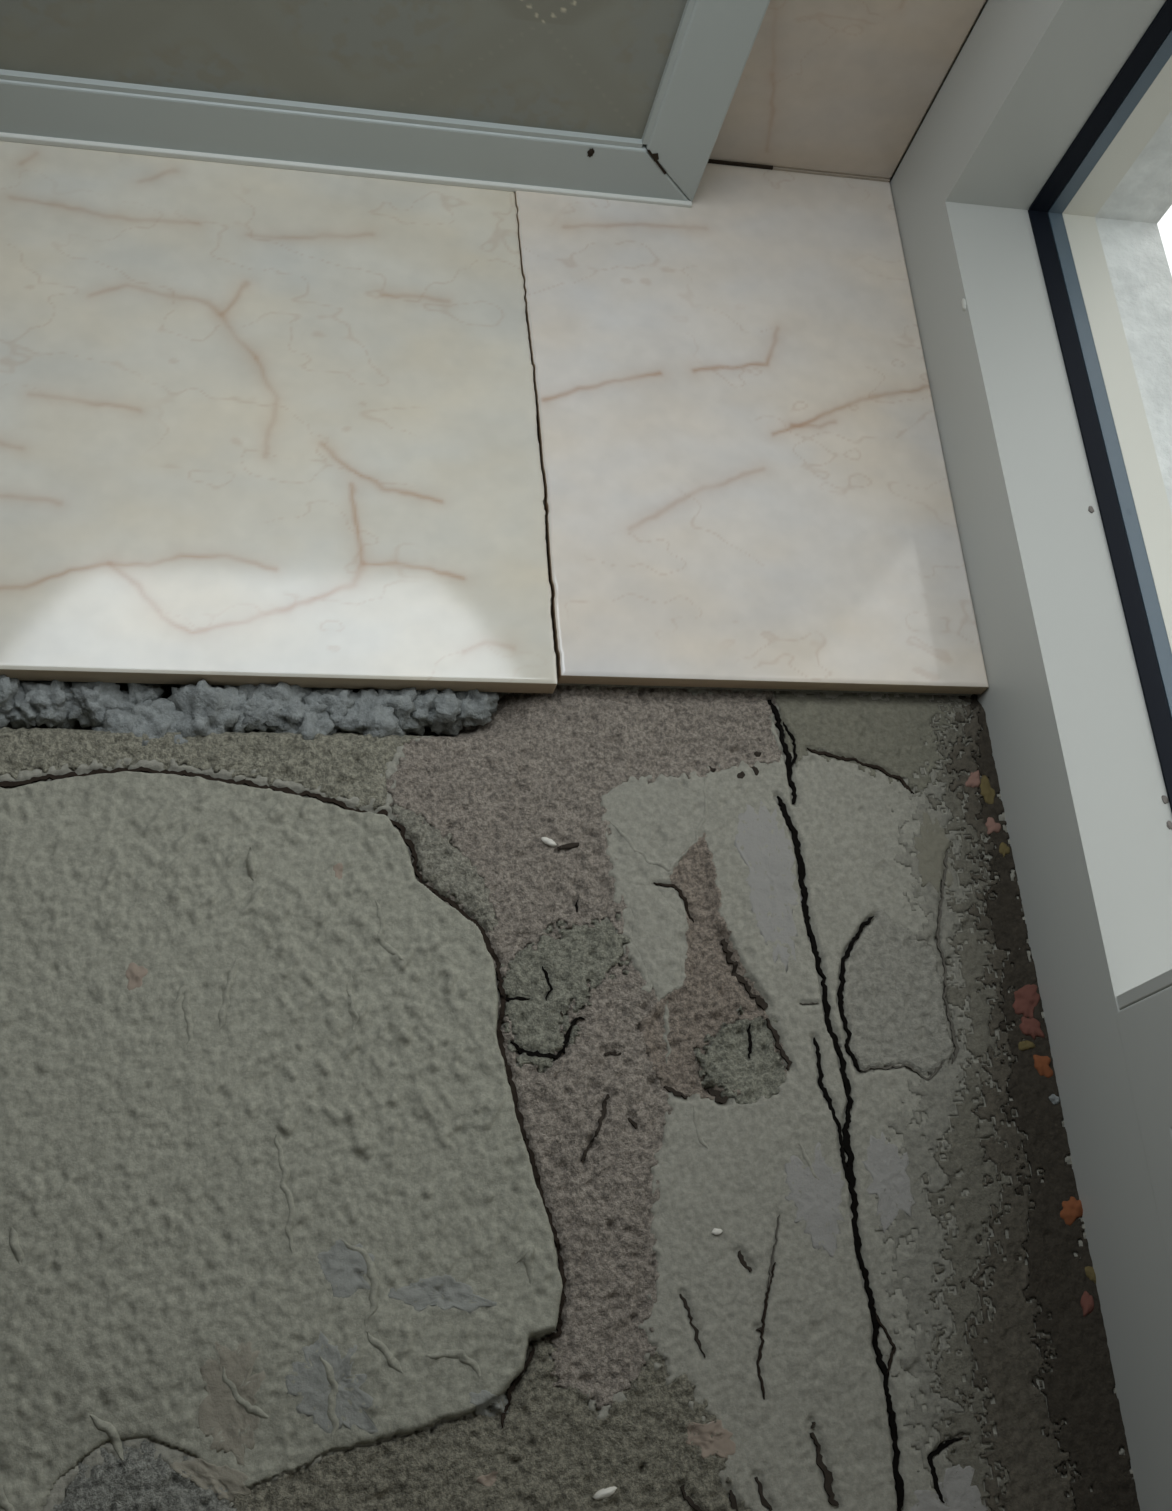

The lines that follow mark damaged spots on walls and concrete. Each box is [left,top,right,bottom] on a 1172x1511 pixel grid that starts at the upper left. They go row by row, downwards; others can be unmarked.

flaking render [985,817,1001,835]
spalling [838,909,954,1075]
spalling [226,685,792,1511]
crack [767,700,963,1511]
crack [756,1215,780,1400]
spalling [810,1422,839,1506]